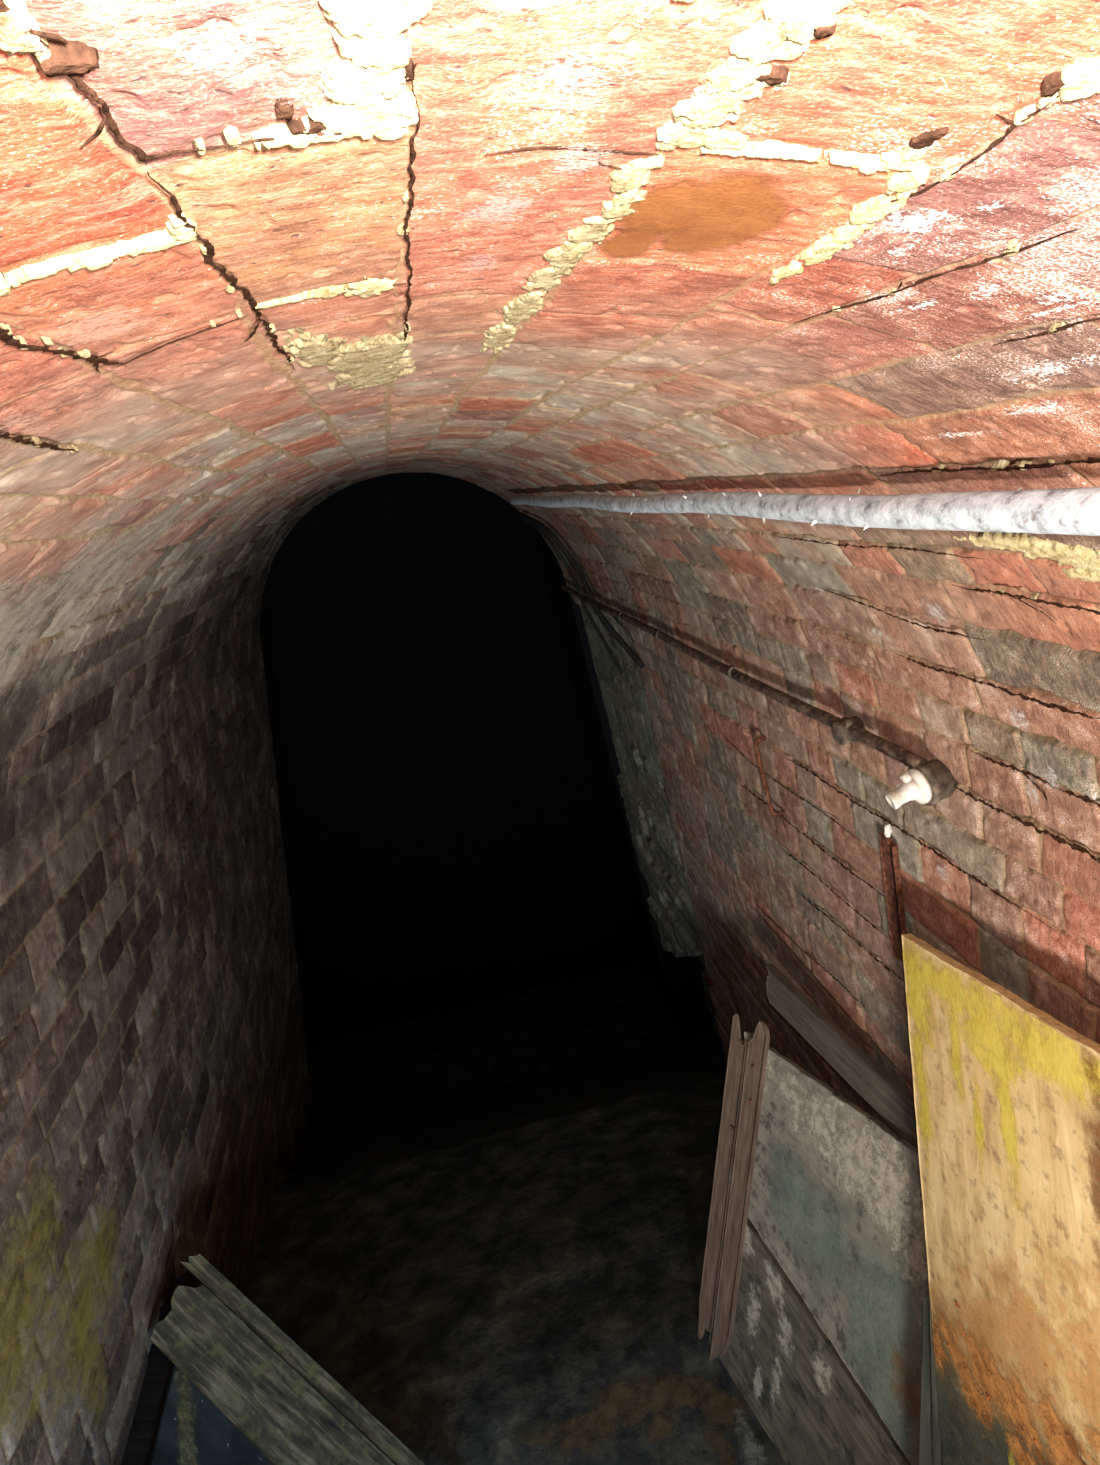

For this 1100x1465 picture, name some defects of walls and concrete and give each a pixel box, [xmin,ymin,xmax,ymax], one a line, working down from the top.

spalling [0,0,100,77]
spalling [250,0,433,151]
spalling [1040,57,1100,101]
spalling [0,212,197,297]
crack [0,0,296,374]
spalling [255,277,398,309]
crack [392,63,420,351]
leakage [603,176,787,257]
spalling [479,0,949,354]
crack [794,229,1077,324]
crack [890,91,1061,203]
crack [0,430,79,454]